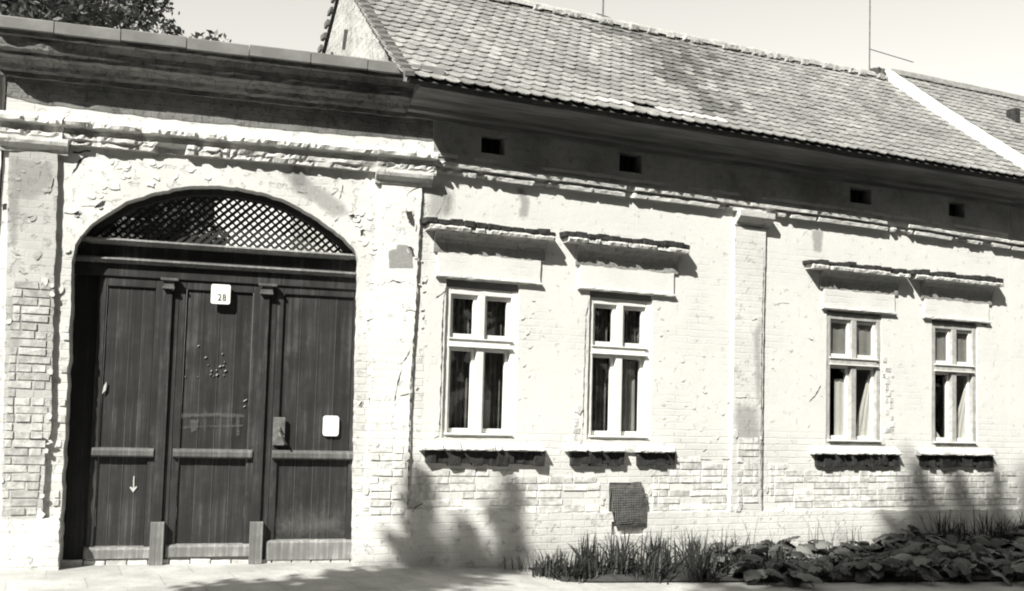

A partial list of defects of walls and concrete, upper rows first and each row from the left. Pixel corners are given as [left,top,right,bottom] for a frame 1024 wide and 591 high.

flaking render [88,160,131,209]
flaking render [147,159,164,187]
flaking render [0,270,67,519]